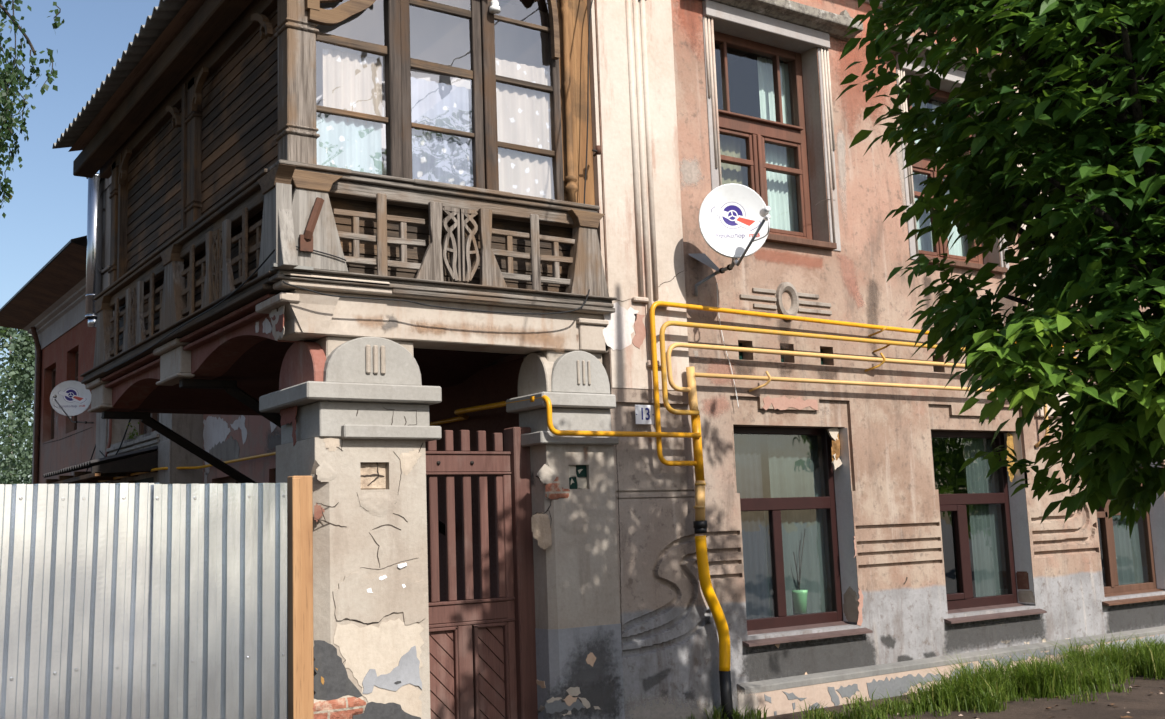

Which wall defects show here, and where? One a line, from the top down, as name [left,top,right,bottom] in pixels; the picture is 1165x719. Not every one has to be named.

peeling [255,306,285,341]
peeling [603,302,646,351]
peeling [203,415,248,484]
flaking render [545,477,570,500]
crack [315,494,416,570]
flaking render [531,513,552,549]
flaking render [313,573,426,719]
peeling [1094,634,1165,651]